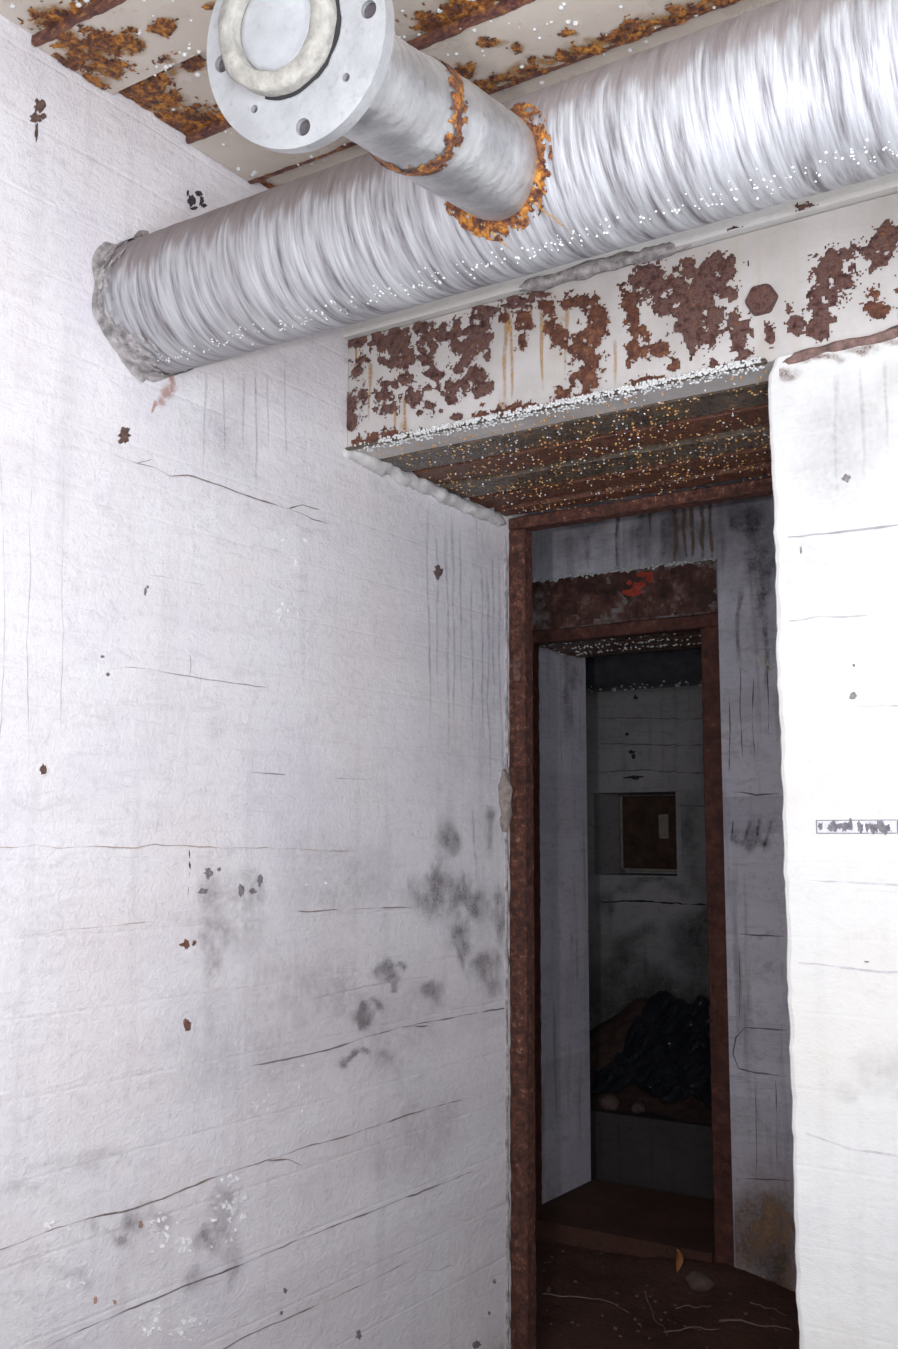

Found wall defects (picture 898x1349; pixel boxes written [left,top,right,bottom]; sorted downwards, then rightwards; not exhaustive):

rust [17,0,232,144]
rust [248,0,740,189]
rust [444,102,563,246]
rust [346,218,898,446]
rust [544,504,717,628]
leakage [425,870,479,916]
leakage [356,1001,381,1029]